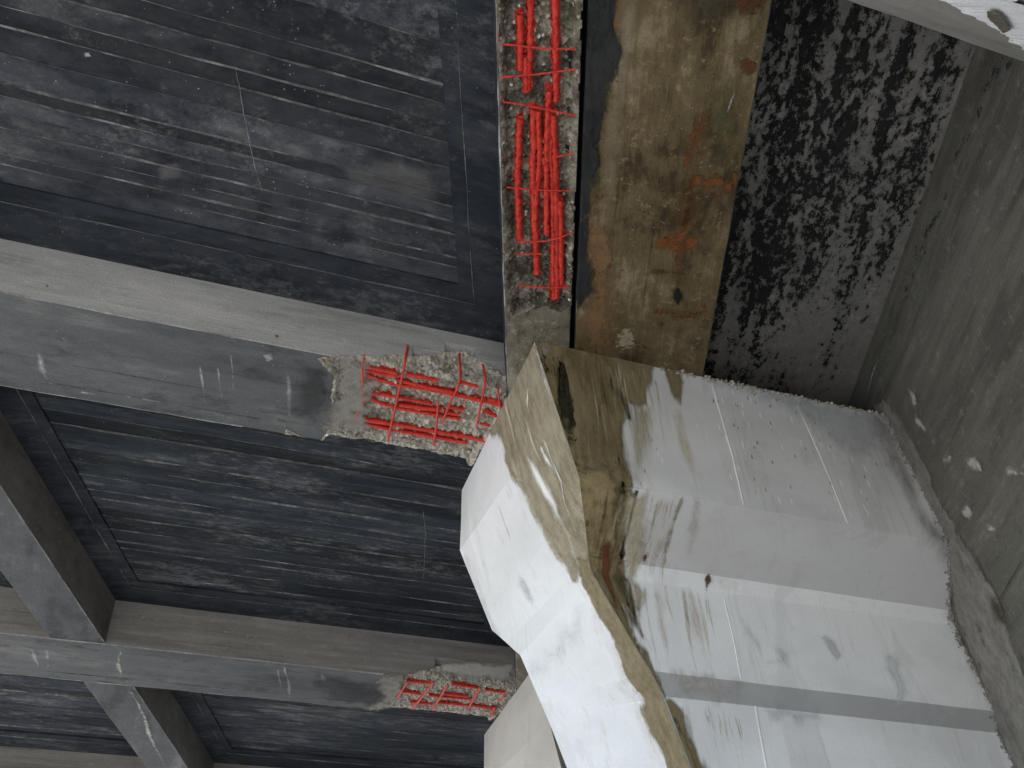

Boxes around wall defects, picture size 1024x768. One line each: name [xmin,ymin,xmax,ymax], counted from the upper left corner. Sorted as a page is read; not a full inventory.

crack [235,66,262,191]
spalling [498,0,583,318]
leakage [704,0,972,396]
spalling [318,345,508,466]
spalling [365,663,517,720]
leakage [490,328,705,768]